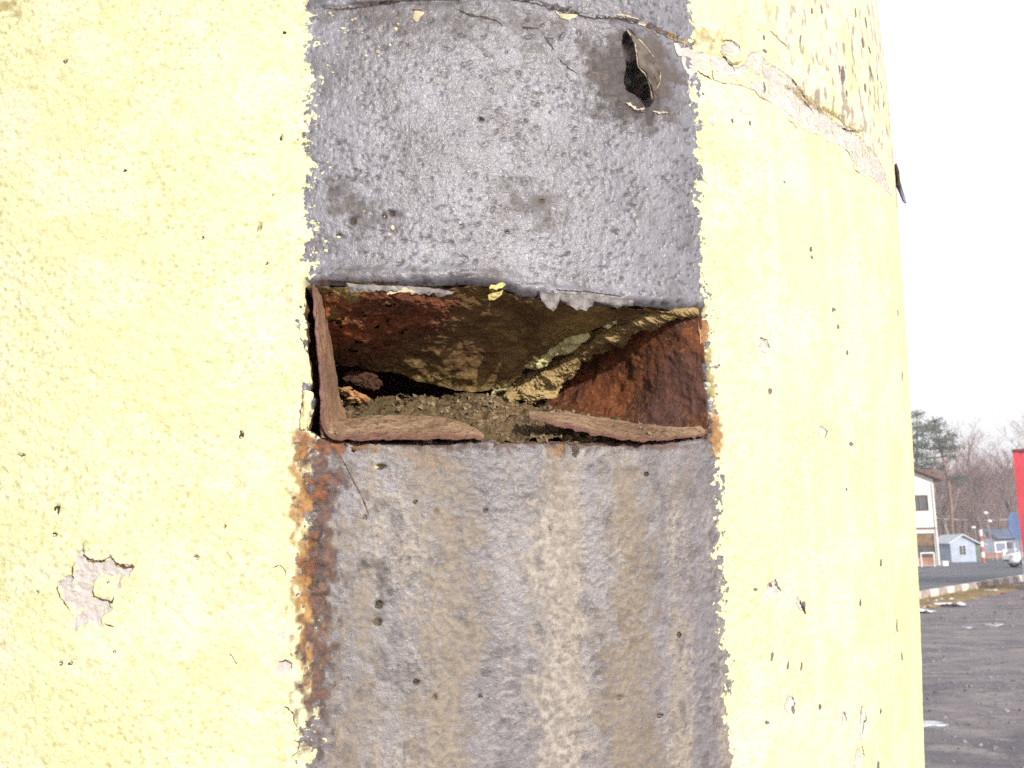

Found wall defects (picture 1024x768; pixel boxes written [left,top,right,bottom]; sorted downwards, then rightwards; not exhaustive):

crack [698,52,863,173]
peeling [667,31,906,204]
peeling [346,283,455,297]
peeling [488,282,506,300]
peeling [539,291,633,311]
peeling [698,320,709,344]
rust [338,370,383,405]
peeling [299,390,314,430]
peeling [56,546,134,631]
rust [290,432,367,726]